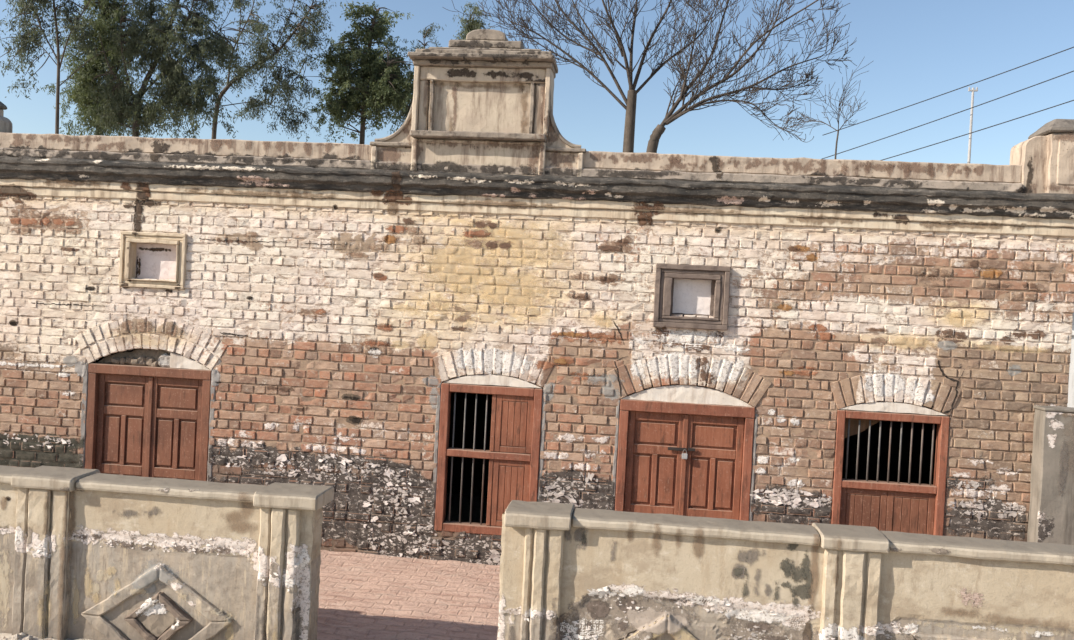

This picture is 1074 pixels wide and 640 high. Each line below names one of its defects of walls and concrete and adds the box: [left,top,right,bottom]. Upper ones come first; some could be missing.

water stain [150,139,170,162]
water stain [709,156,724,179]
water stain [928,163,983,178]
peeling [0,184,82,235]
water stain [120,181,171,289]
flaking render [920,199,1074,230]
peeling [550,325,750,386]
crack [938,360,965,413]
water stain [608,456,832,629]
peeling [249,544,312,640]
flaking render [505,586,699,640]
flaking render [718,610,916,640]